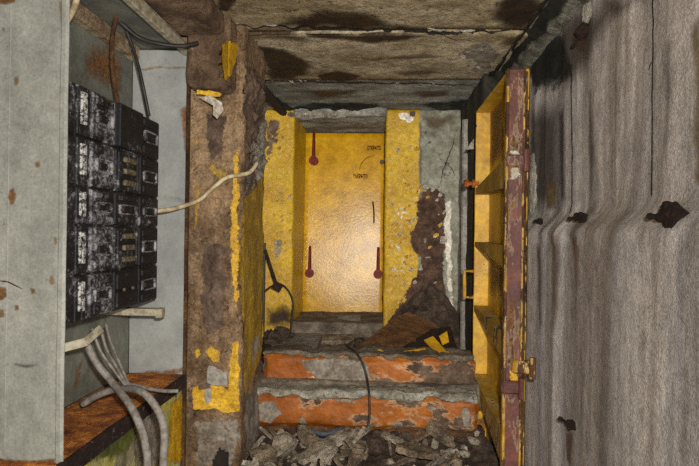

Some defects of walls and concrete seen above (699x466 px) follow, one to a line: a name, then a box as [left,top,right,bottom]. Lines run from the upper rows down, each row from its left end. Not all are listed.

leakage [259,47,310,79]
leakage [250,12,417,43]
leakage [318,71,360,80]
crack [236,11,529,41]
leakage [489,0,567,81]
leakage [530,16,601,94]
leakage [532,115,564,203]
peeling [274,229,292,258]
spalling [385,157,454,323]
peeling [192,90,287,466]
peeling [302,357,370,381]
peeling [462,408,470,428]